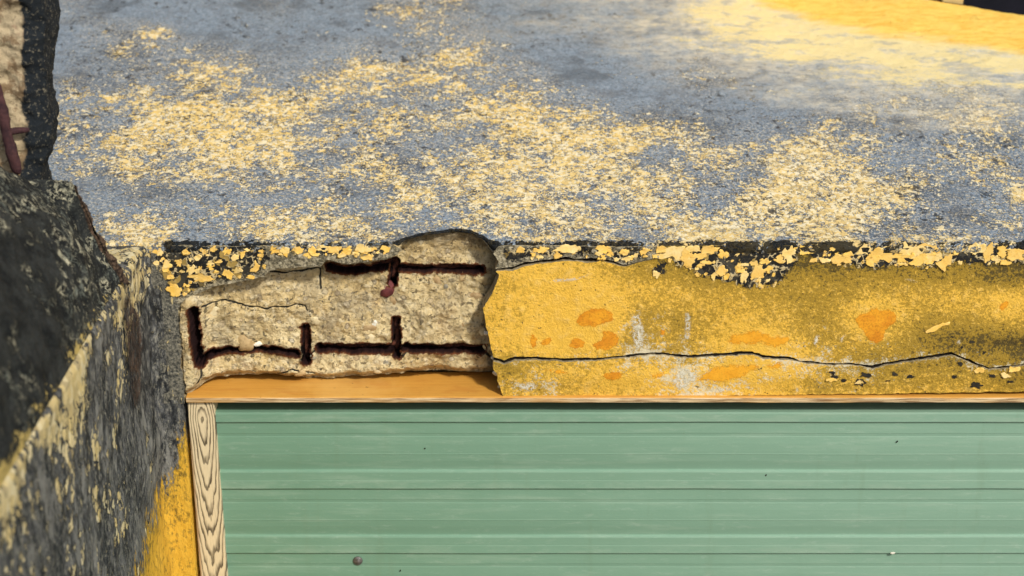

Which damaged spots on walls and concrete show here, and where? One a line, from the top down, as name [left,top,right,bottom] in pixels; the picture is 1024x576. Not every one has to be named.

rust [0,84,30,175]
crack [201,267,322,311]
rust [184,306,487,369]
spalling [179,232,500,394]
rust [324,256,487,289]
crack [485,351,1021,369]